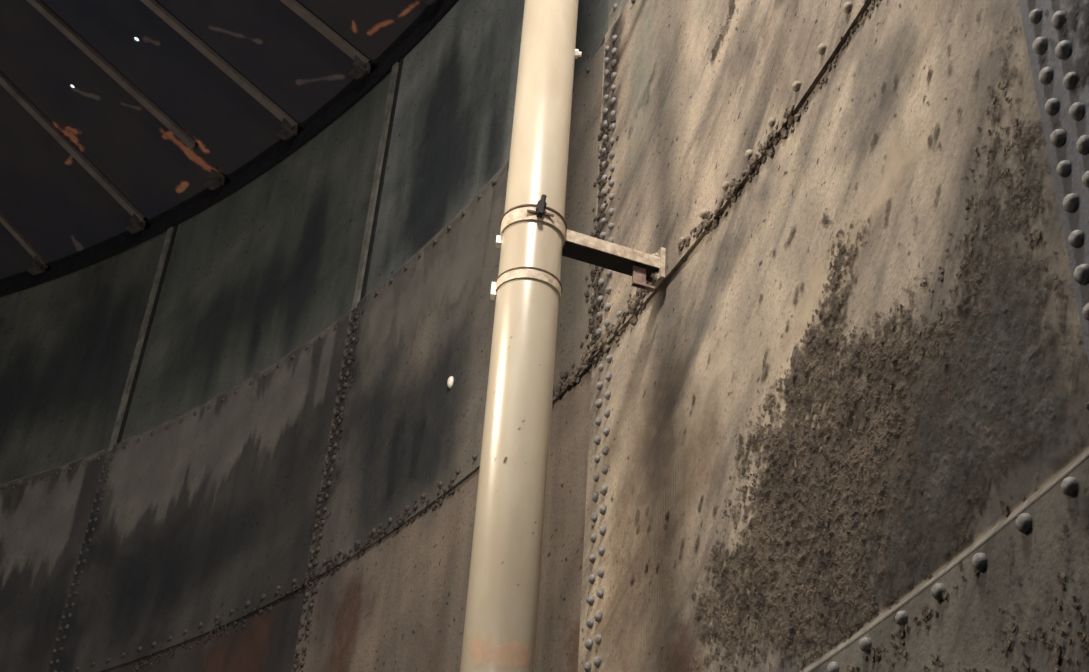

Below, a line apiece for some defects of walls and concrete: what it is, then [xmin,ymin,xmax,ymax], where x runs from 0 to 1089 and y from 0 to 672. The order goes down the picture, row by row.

corrosion [352,3,417,35]
corrosion [54,123,82,150]
corrosion [161,130,221,174]
damp [0,164,506,585]